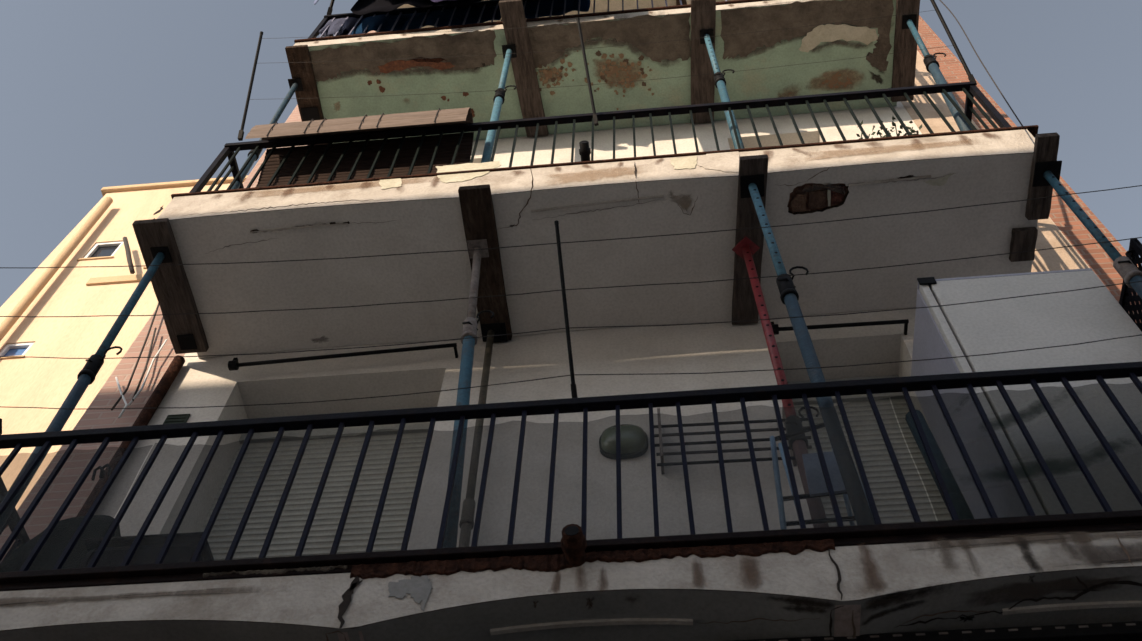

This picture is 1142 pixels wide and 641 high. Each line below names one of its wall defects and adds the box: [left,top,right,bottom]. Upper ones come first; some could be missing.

peeling [309,30,497,93]
peeling [720,0,894,72]
corrosion [812,70,861,90]
crack [500,163,698,229]
spalling [787,183,849,215]
crack [326,576,363,641]
peeling [388,575,433,614]
corrosion [203,539,835,608]
crack [694,548,856,638]
crack [894,532,1142,628]